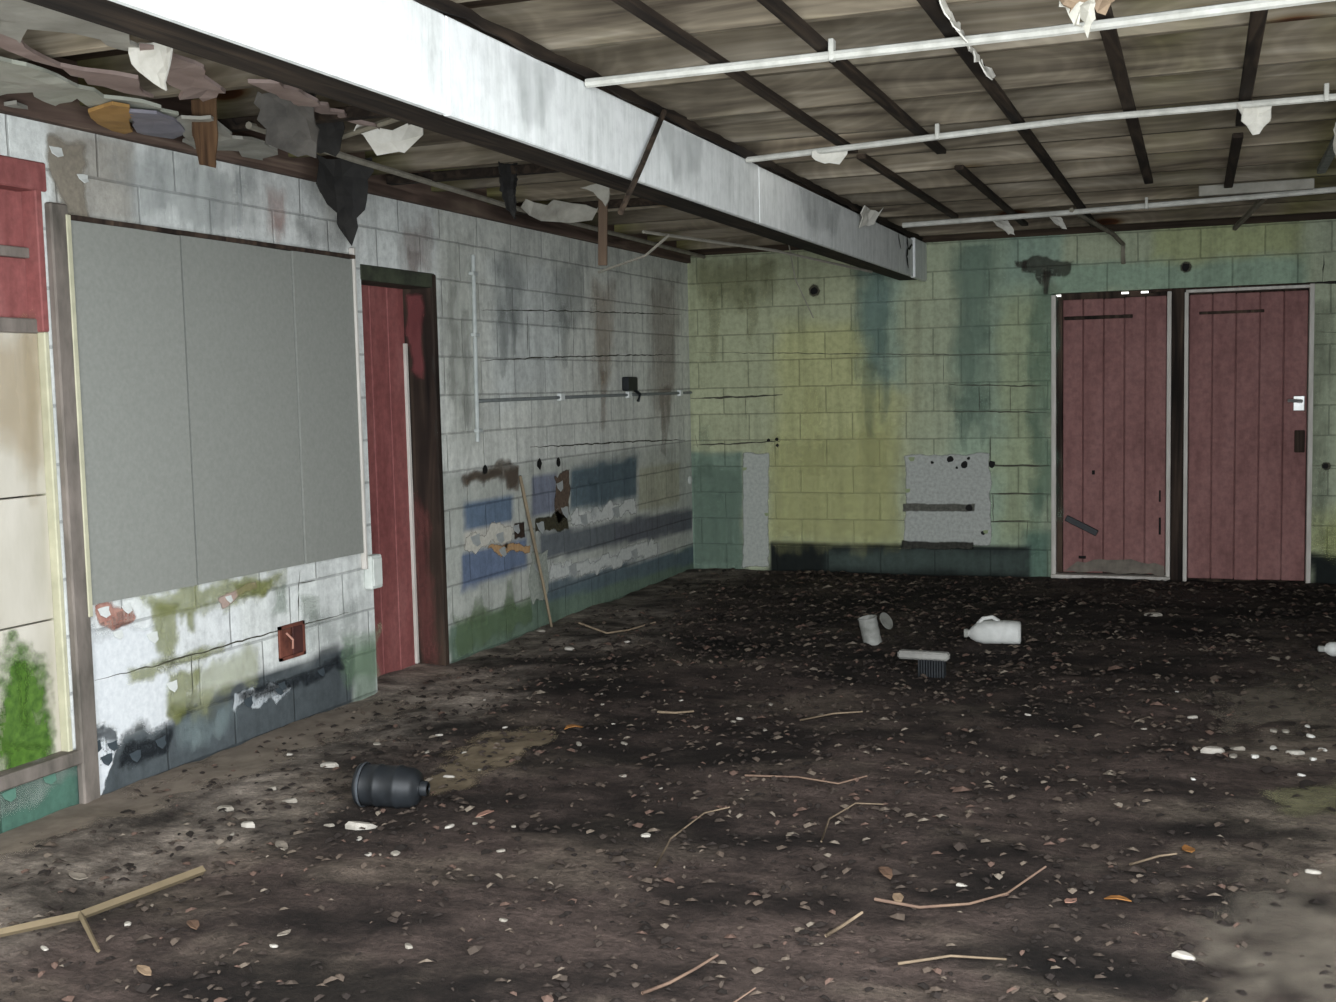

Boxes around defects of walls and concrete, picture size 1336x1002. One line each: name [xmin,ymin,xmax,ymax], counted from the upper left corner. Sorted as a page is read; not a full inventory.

peeling [47,134,89,217]
crack [1292,264,1336,285]
peeling [462,457,657,604]
flaking render [91,602,178,795]
peeling [233,657,344,710]
damp [5,744,48,769]